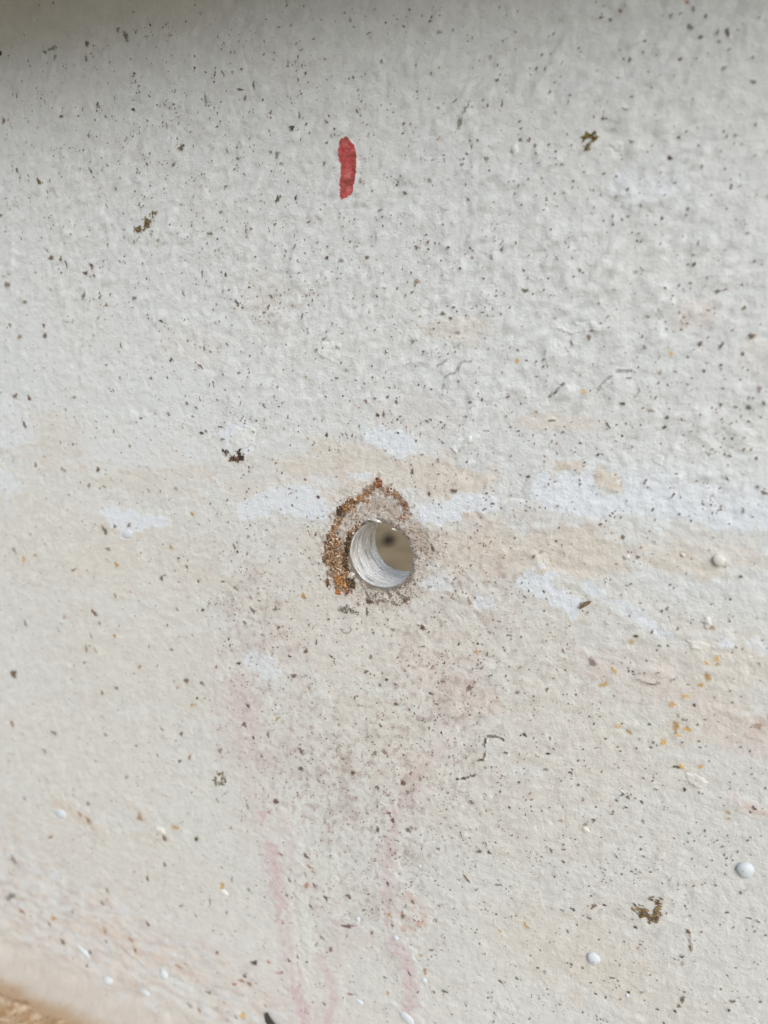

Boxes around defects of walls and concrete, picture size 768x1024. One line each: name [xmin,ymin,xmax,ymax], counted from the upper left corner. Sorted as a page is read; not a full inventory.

corrosion [315,472,448,617]